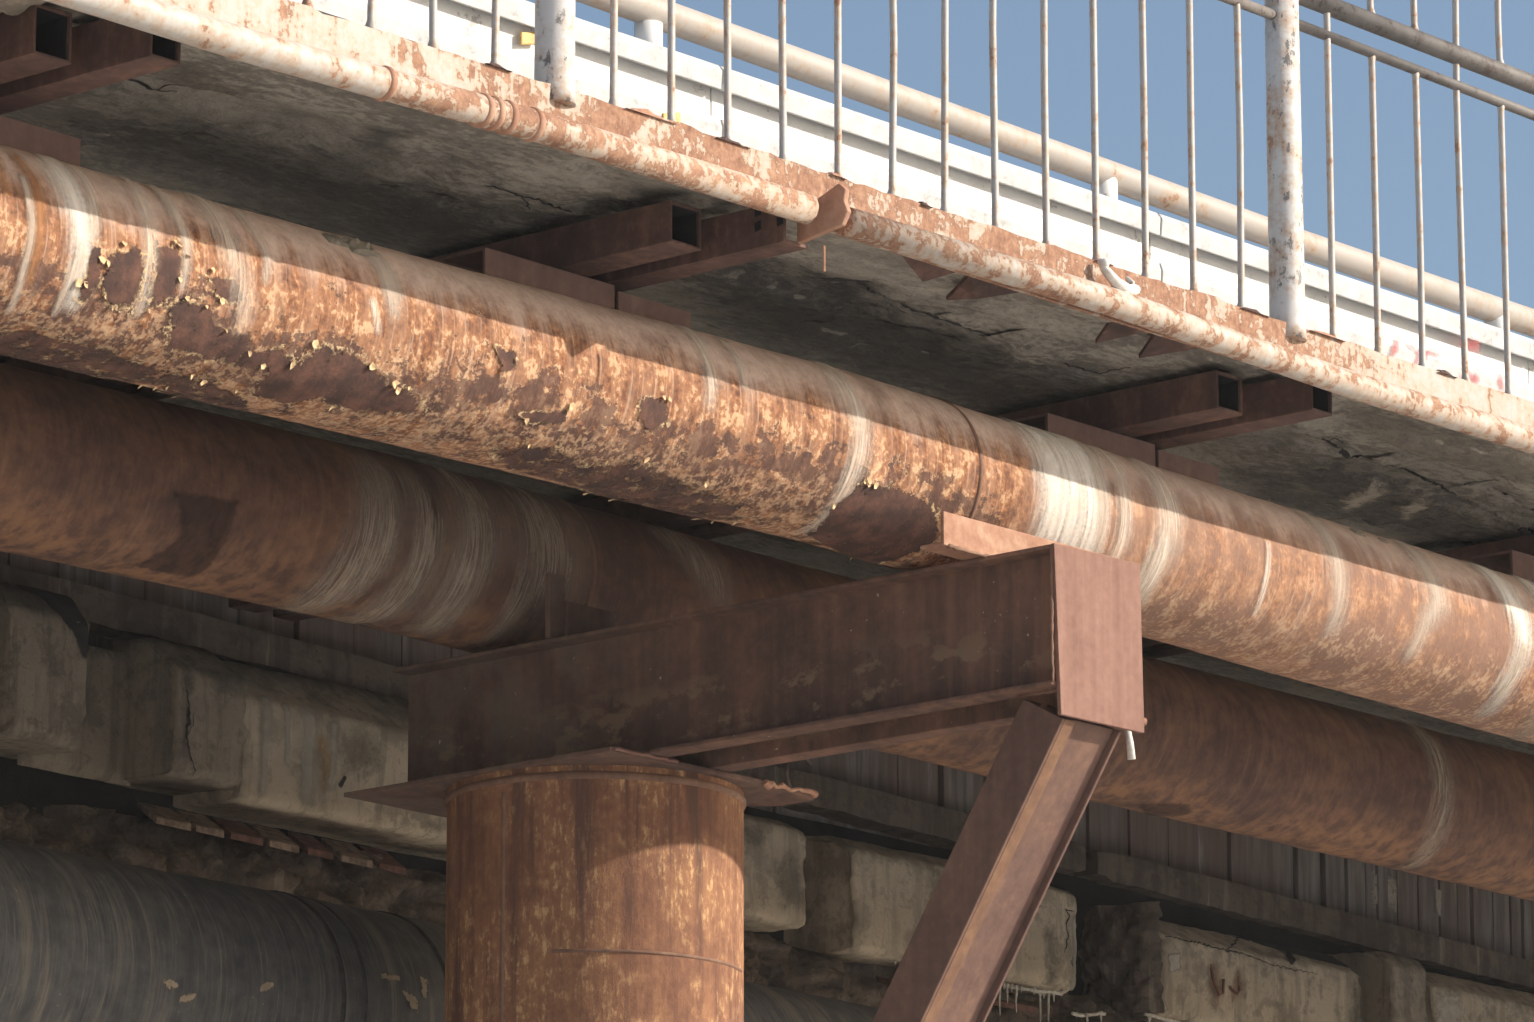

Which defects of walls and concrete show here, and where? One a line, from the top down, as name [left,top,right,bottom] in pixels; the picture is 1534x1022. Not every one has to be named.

corrosion [0,154,45,311]
damp [36,153,99,313]
damp [112,119,483,330]
corrosion [0,234,429,417]
corrosion [494,344,521,379]
corrosion [483,402,746,525]
corrosion [636,392,672,433]
corrosion [803,477,942,564]
crack [185,690,196,775]
spalling [1077,901,1181,1015]
efflorescence [1143,1012,1181,1022]